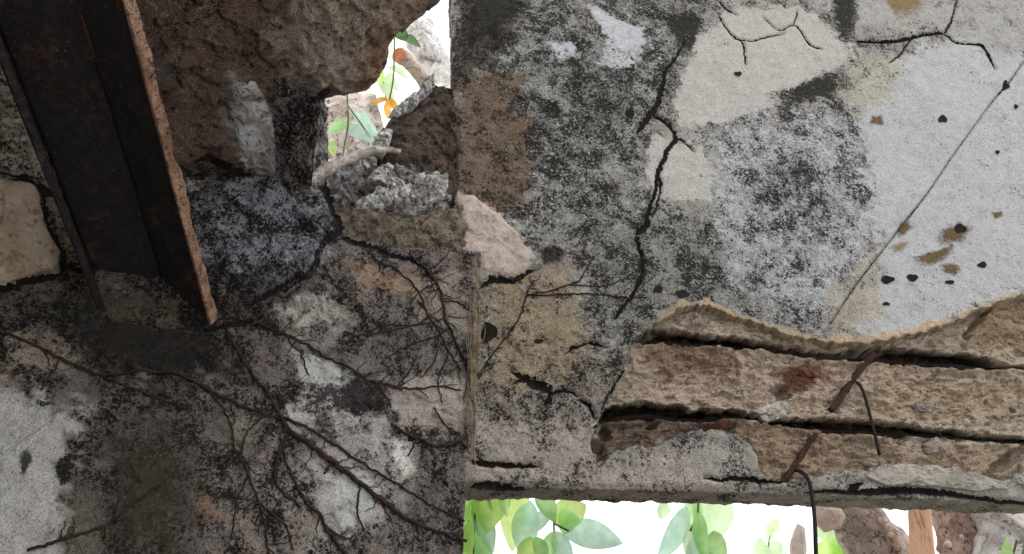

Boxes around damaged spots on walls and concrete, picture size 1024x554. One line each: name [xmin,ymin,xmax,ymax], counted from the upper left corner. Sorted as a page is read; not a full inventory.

crack [718,1,821,65]
crack [613,44,693,320]
crack [830,0,1024,324]
crack [509,370,624,434]
crack [566,341,604,354]
corrosion [783,364,824,390]
spalling [590,299,1024,493]